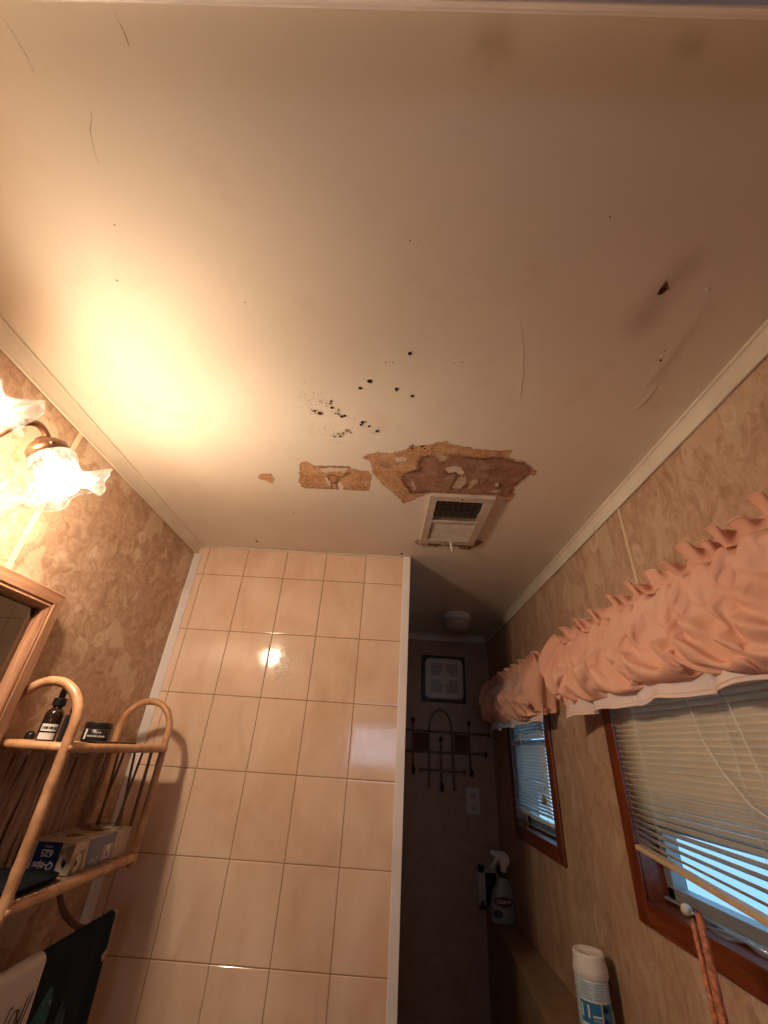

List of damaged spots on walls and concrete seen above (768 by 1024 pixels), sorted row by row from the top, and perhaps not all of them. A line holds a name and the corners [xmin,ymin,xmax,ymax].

damp [300,385,378,438]